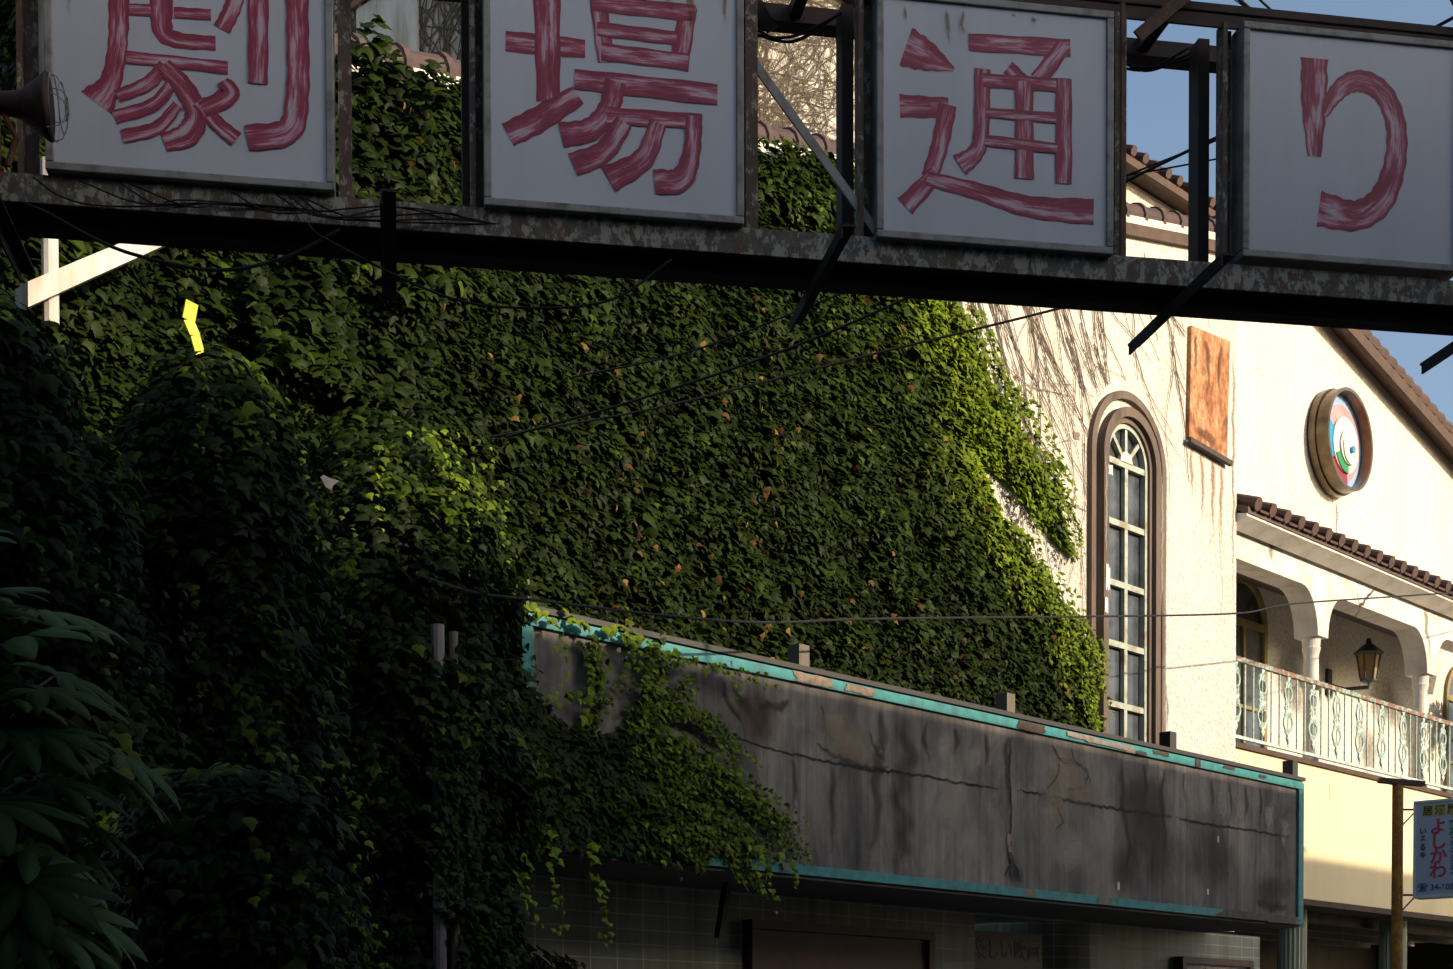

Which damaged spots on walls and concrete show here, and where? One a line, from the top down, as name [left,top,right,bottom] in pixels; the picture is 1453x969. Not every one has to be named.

leakage [724,683,789,737]
crack [733,737,1286,880]